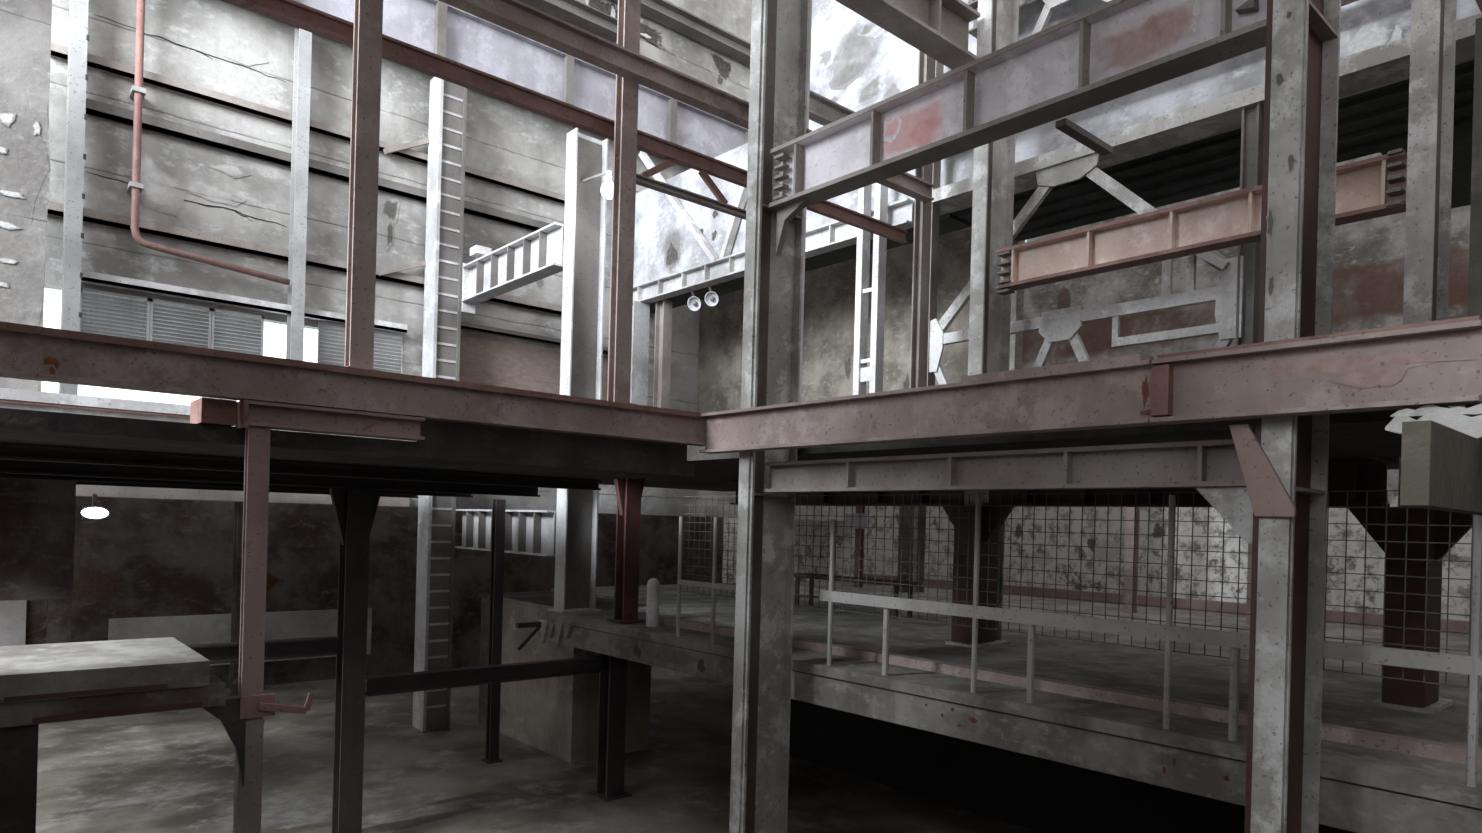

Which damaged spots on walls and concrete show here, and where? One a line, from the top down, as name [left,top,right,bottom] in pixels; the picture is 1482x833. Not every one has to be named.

crack [94,14,286,82]
corrosion [1089,0,1215,82]
peeling [0,111,41,136]
peeling [0,189,26,199]
peeling [0,220,22,230]
crack [184,200,286,227]